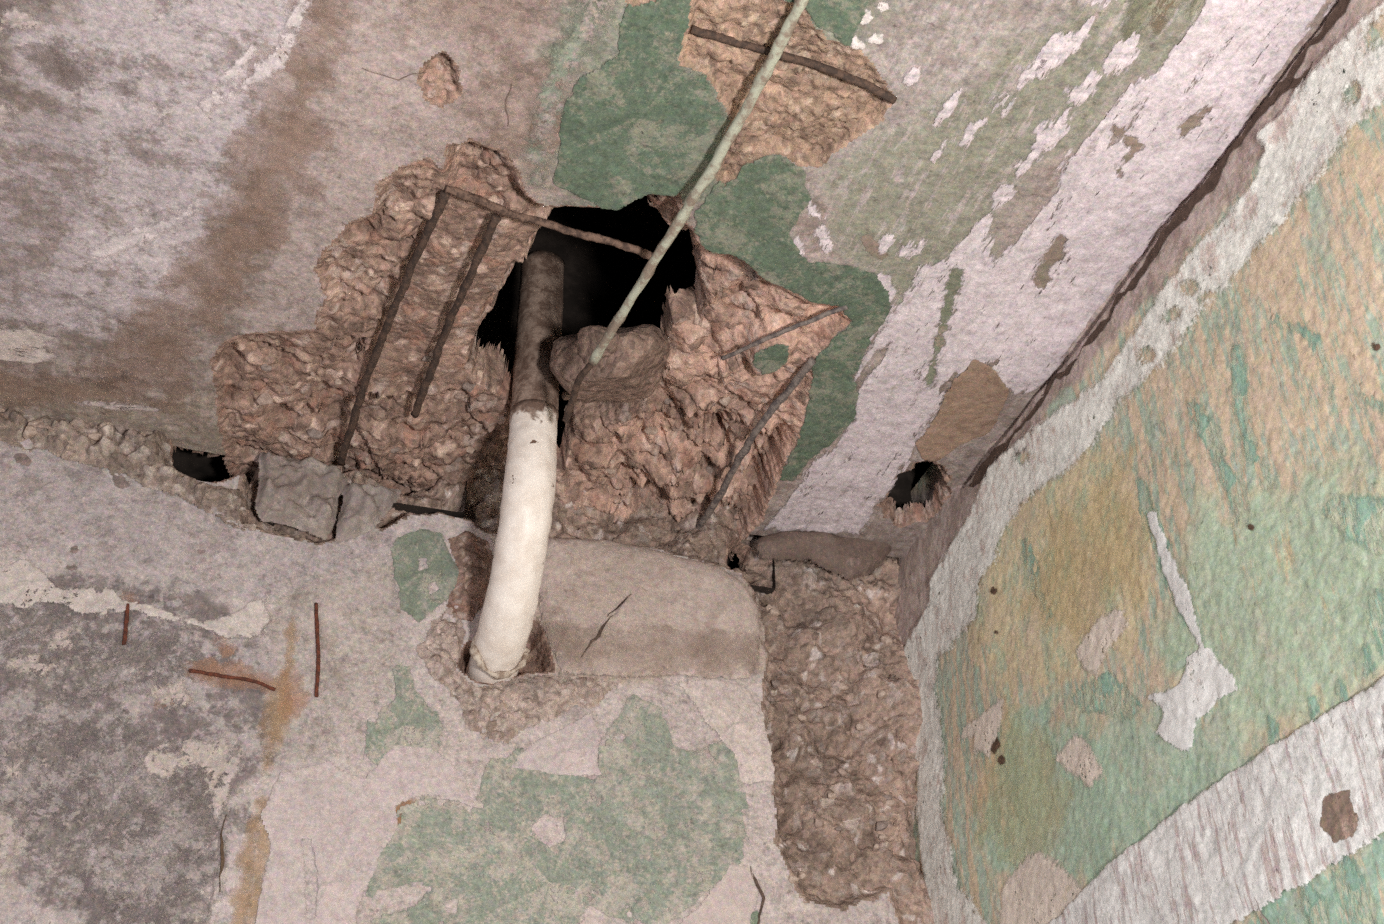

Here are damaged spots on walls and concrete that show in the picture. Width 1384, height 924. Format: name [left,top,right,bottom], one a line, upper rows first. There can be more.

spalling [0,0,794,744]
peeling [548,0,1384,924]
flaking render [0,609,244,924]
corrosion [122,603,130,645]
corrosion [189,669,276,691]
peeling [364,665,443,765]
peeling [366,694,749,924]